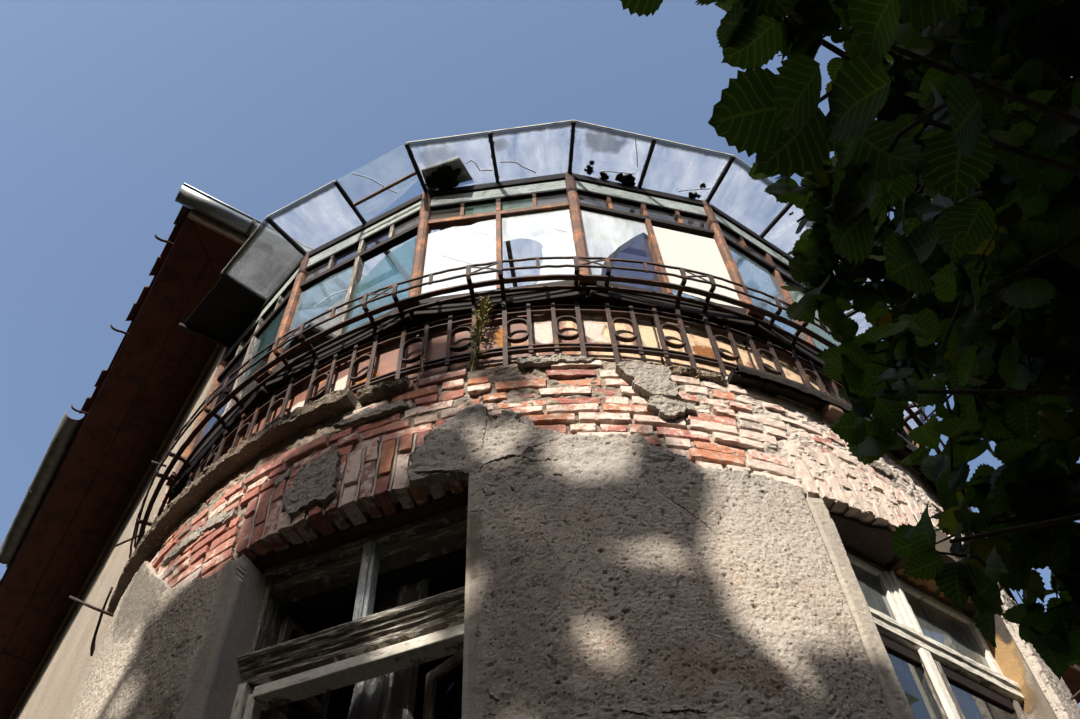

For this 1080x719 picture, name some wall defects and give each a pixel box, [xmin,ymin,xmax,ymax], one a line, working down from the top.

peeling [532,321,553,344]
peeling [582,321,609,343]
peeling [637,325,660,348]
crack [412,422,573,512]
spalling [146,360,974,588]